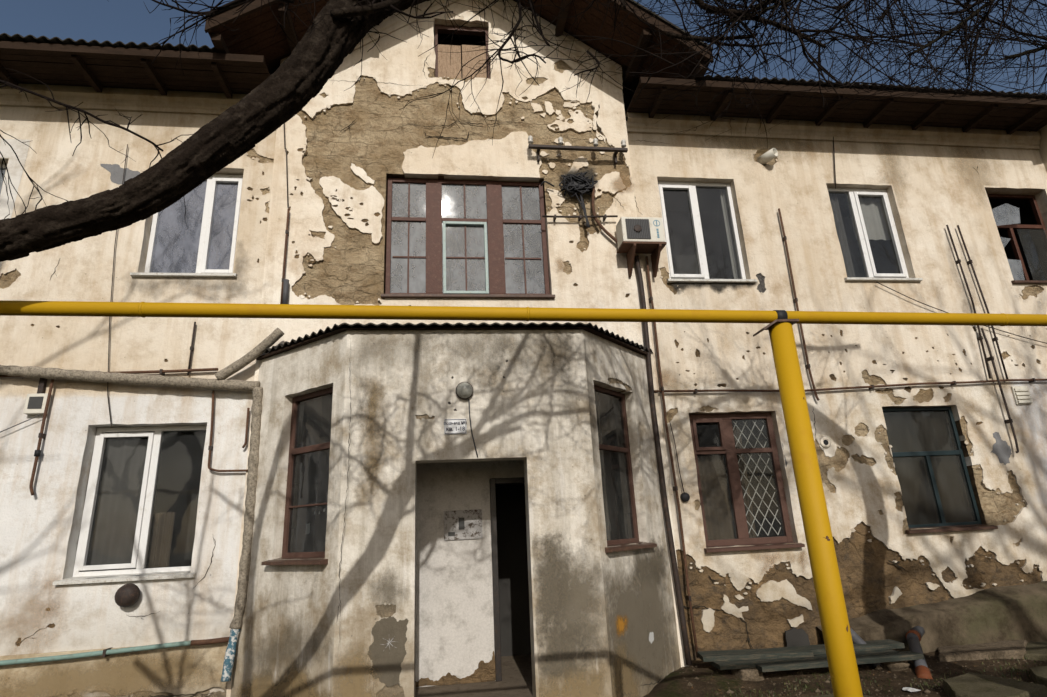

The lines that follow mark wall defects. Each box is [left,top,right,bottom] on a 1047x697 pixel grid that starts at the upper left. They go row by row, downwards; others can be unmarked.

flaking render [244,149,274,224]
peeling [287,61,634,305]